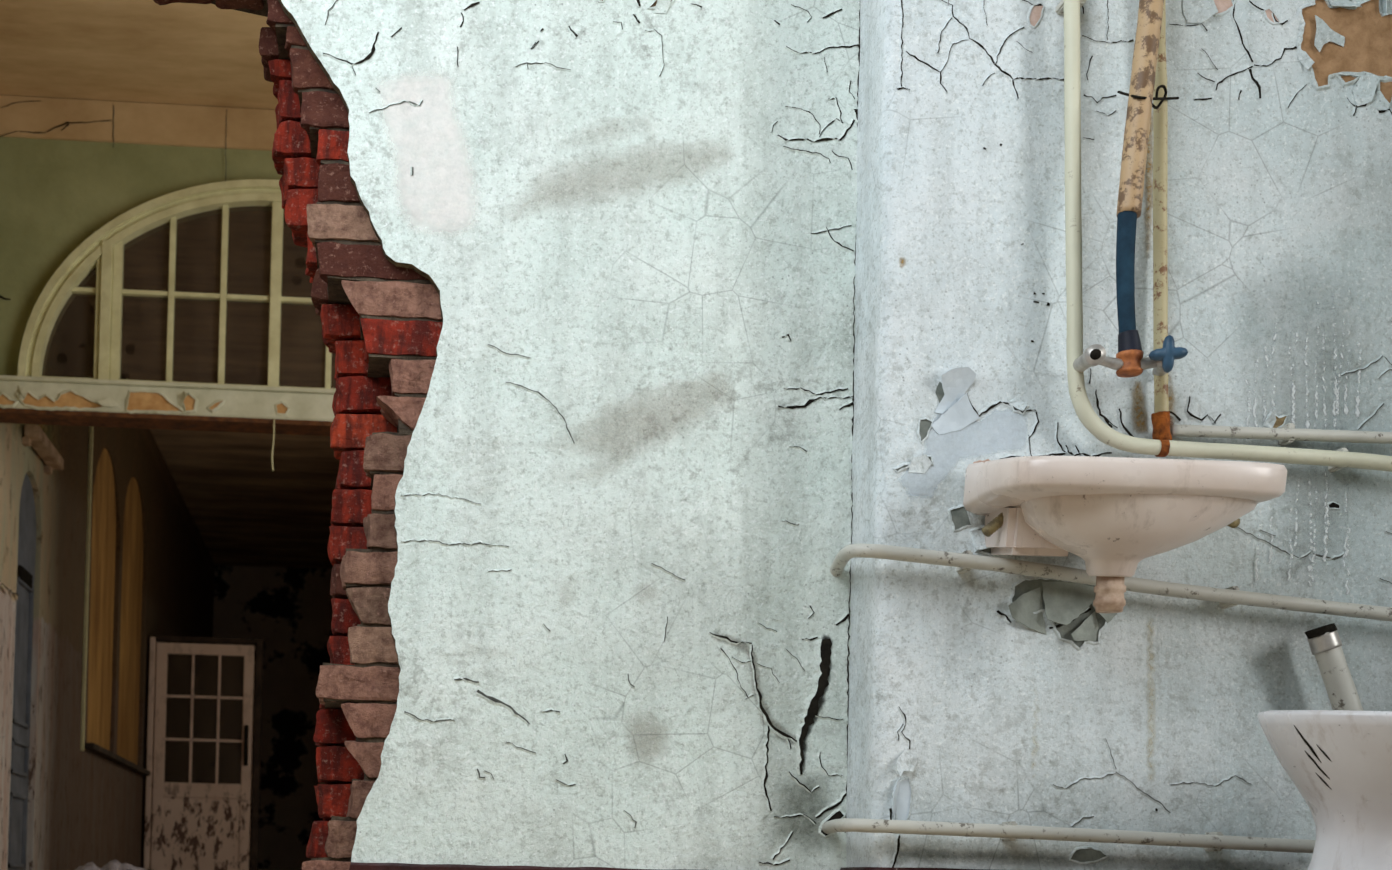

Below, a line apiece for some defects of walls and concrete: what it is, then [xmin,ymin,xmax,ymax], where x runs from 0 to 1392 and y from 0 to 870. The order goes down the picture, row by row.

crack [455,0,480,67]
crack [514,26,578,72]
crack [770,4,860,170]
crack [897,0,1134,142]
crack [1168,0,1307,108]
peeling [1263,0,1392,109]
peeling [0,384,225,415]
peeling [892,367,979,474]
crack [967,368,1134,459]
crack [1169,396,1221,426]
crack [709,218,857,867]
crack [404,676,576,787]